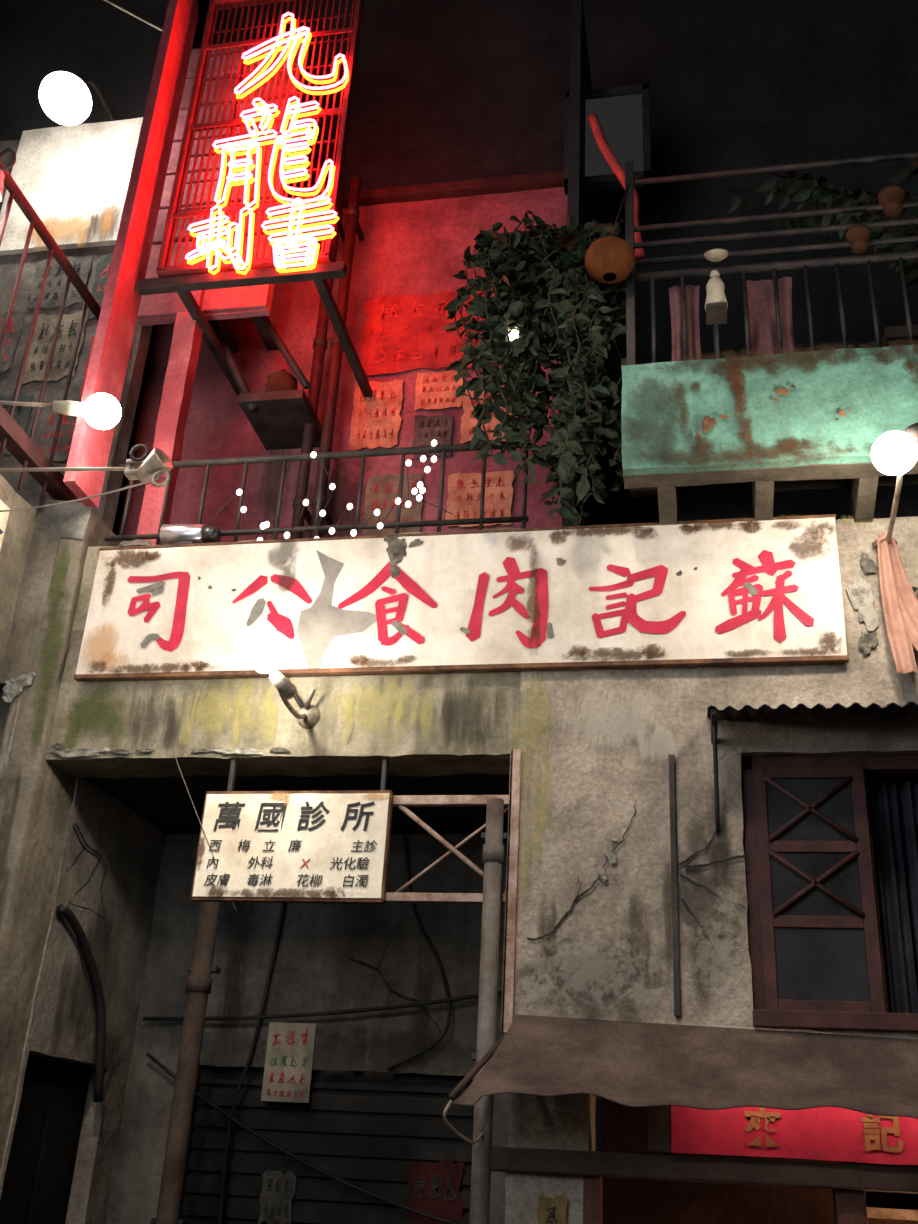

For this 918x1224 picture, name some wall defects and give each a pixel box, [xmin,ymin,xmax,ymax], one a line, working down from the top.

corrosion [664,345,854,467]
corrosion [877,341,918,382]
peeling [846,553,879,654]
crack [527,802,636,962]
crack [678,830,750,957]